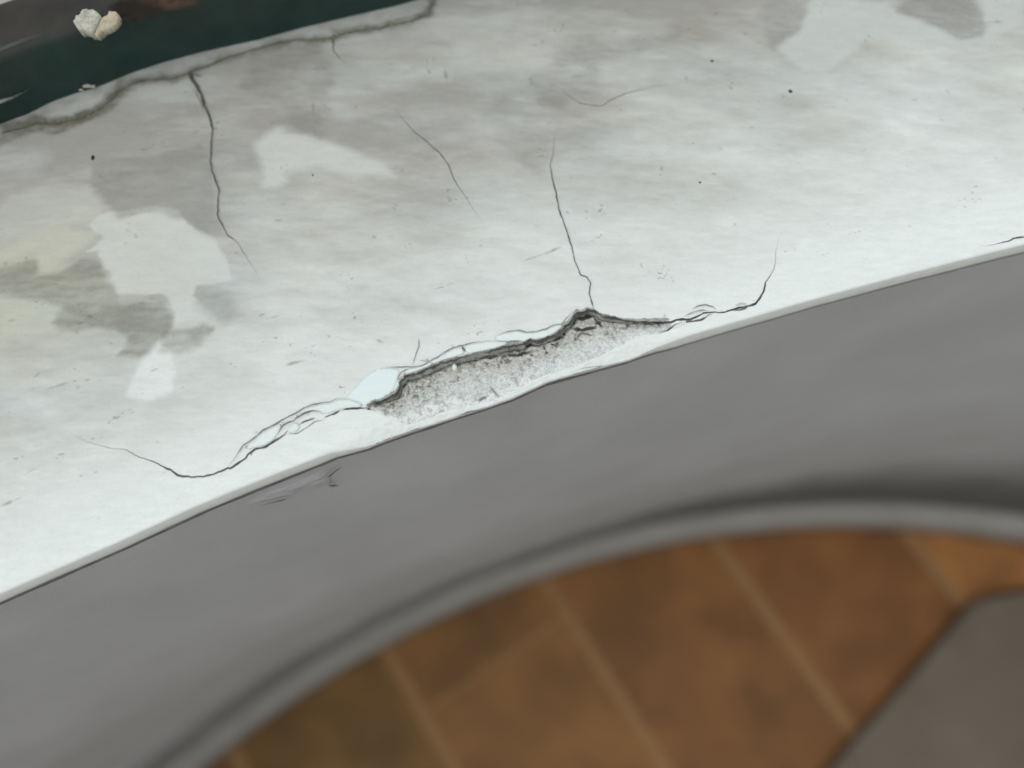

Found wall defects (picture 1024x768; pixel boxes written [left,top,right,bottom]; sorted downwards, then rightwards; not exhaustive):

crack [189,72,234,240]
crack [409,126,458,186]
crack [551,171,593,305]
flaking render [346,309,671,425]
crack [0,276,770,605]